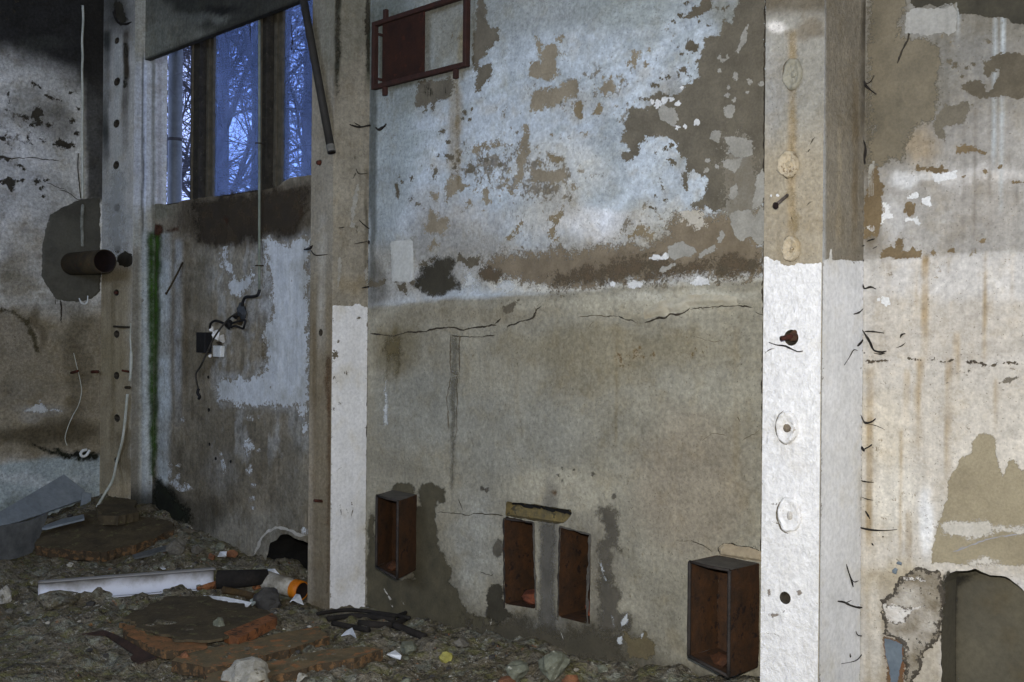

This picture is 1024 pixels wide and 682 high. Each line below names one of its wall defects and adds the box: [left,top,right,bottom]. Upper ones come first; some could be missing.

leakage [147,232,194,524]
leakage [191,186,311,248]
crack [367,304,541,436]
peeling [471,0,501,93]
peeling [394,34,587,269]
crack [579,241,764,451]
peeling [620,0,766,212]
crack [760,0,768,172]
peeling [880,237,956,259]
peeling [863,0,1024,239]
leakage [366,337,655,662]
spalling [880,561,947,682]